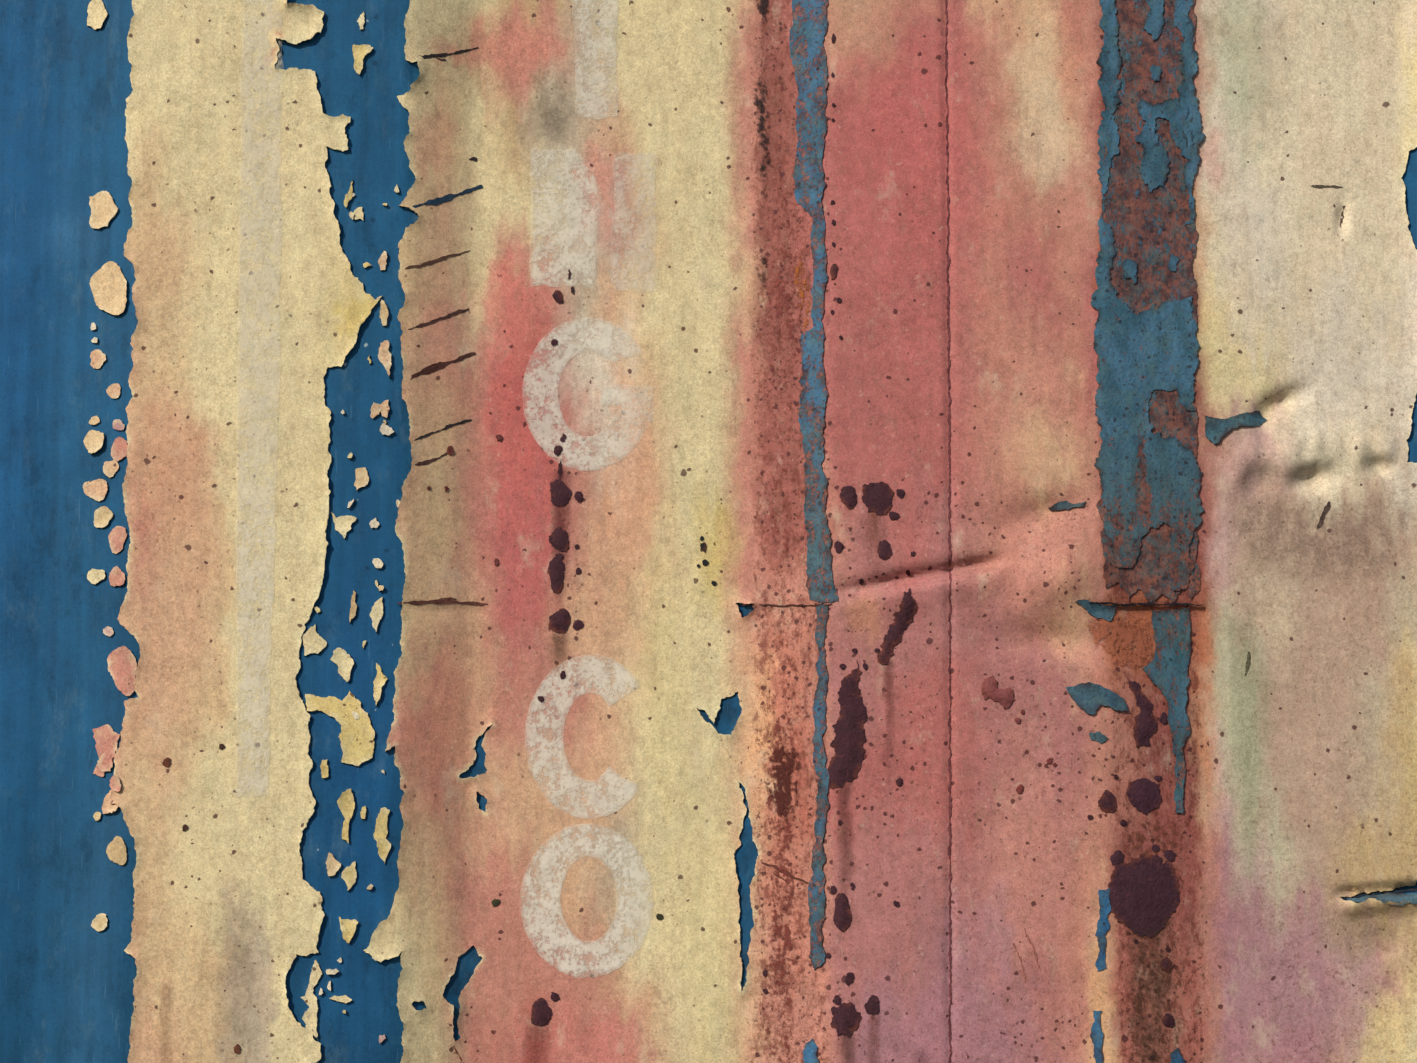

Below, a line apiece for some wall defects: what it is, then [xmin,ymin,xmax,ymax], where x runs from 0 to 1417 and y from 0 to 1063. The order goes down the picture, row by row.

corrosion [753,82,787,180]
corrosion [757,0,785,67]
peeling [83,0,389,1063]
corrosion [547,433,584,679]
corrosion [839,481,905,560]
peeling [363,0,1417,1063]
corrosion [827,551,917,853]
corrosion [1087,614,1168,748]
corrosion [531,992,560,1063]
corrosion [763,686,801,1063]
corrosion [830,882,855,932]
corrosion [1088,775,1182,1063]